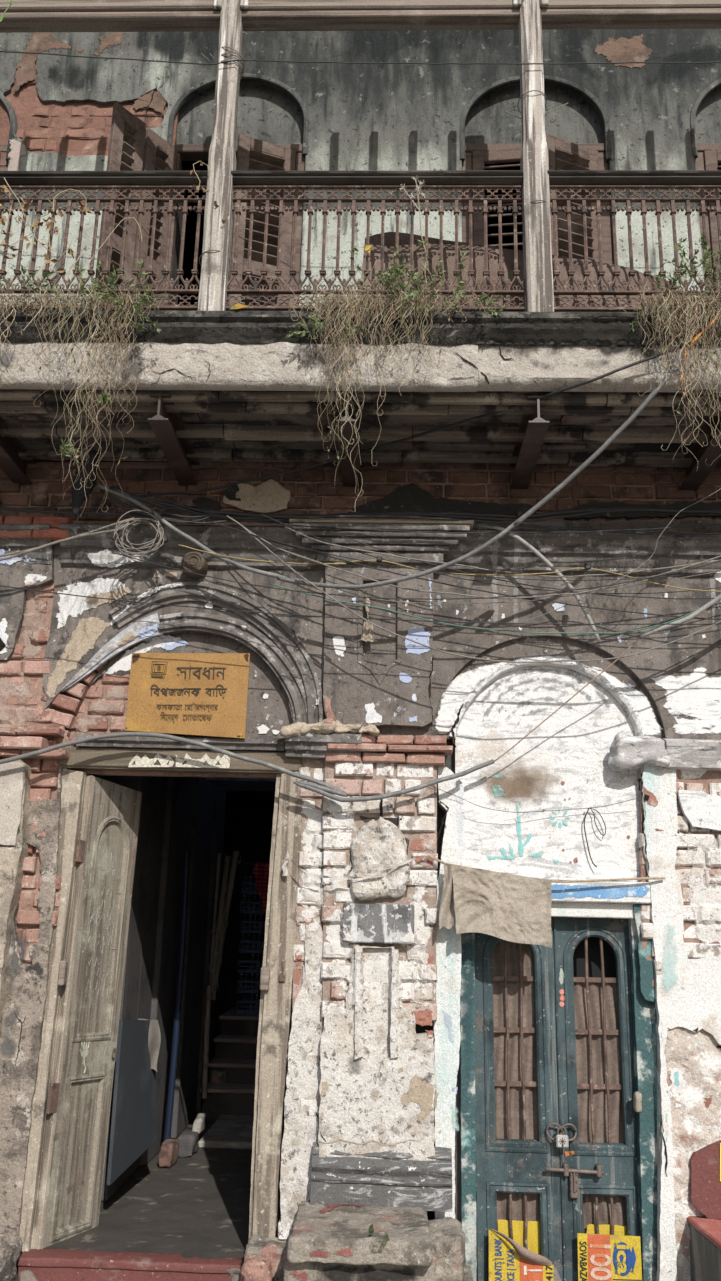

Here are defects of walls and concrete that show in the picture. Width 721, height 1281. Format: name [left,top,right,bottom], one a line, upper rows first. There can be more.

flaking render [595,34,652,68]
flaking render [0,32,179,171]
flaking render [0,516,73,586]
peeling [0,618,9,654]
flaking render [45,549,189,699]
flaking render [410,839,435,867]
flaking render [294,954,302,985]
flaking render [411,1009,434,1039]
flaking render [398,1067,439,1121]
spalling [664,1026,721,1213]